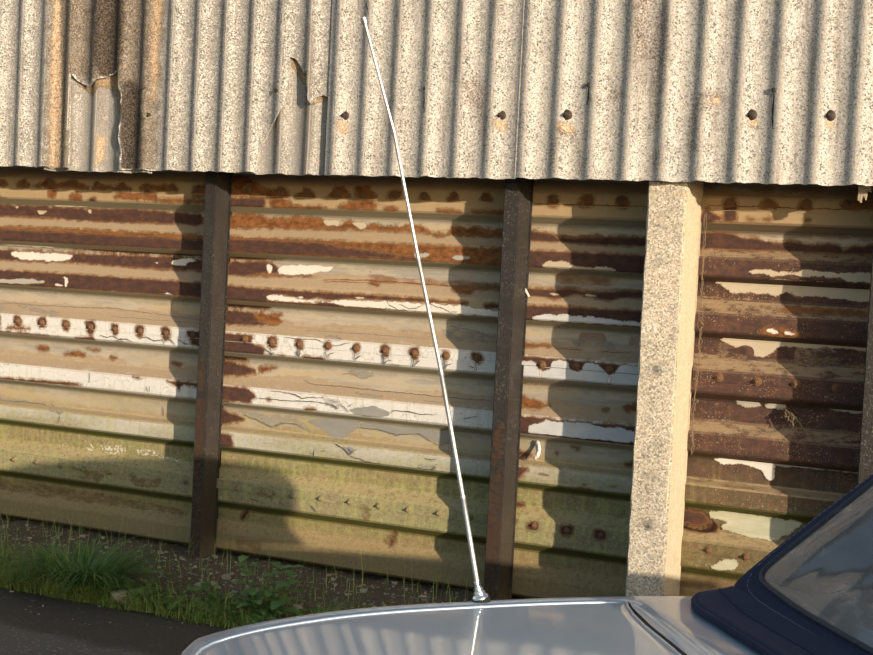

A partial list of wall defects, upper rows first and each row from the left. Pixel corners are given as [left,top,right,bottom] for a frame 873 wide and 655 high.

damp [45,0,164,169]
corrosion [0,178,205,298]
peeling [266,264,334,276]
corrosion [529,229,646,273]
corrosion [700,196,873,256]
peeling [716,269,871,302]
corrosion [220,175,503,447]
corrosion [526,287,643,328]
peeling [720,324,866,358]
peeling [528,419,635,460]
peeling [714,458,858,481]
peeling [709,511,802,541]